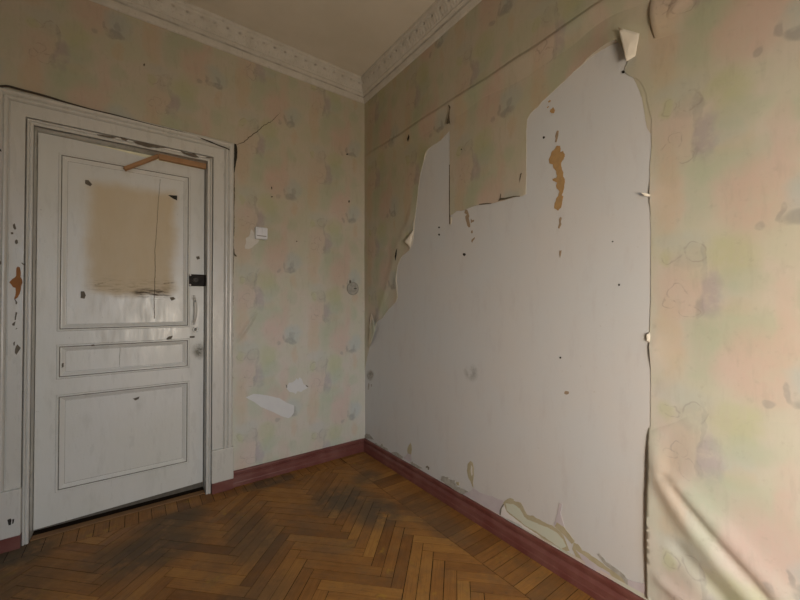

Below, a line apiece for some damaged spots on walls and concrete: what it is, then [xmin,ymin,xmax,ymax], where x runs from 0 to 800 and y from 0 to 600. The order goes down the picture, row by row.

peeling [9,263,25,329]
peeling [365,28,652,595]